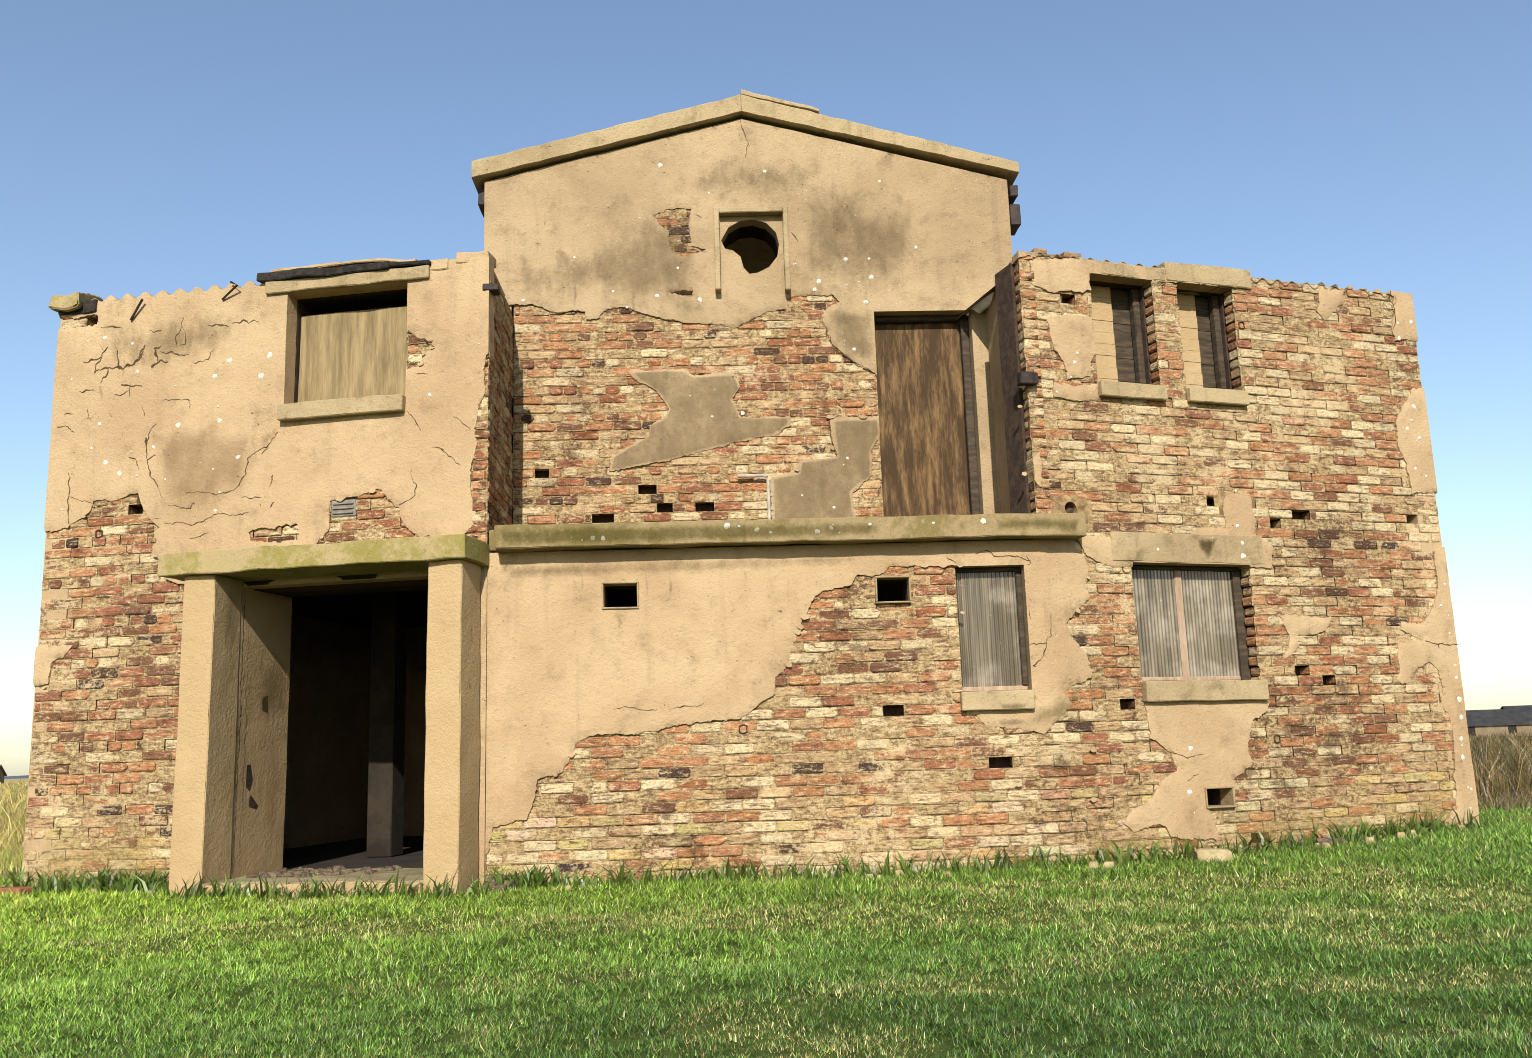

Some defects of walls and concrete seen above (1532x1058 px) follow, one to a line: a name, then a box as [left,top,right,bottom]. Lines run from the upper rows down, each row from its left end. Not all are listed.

spalling [654,209,701,257]
crack [60,317,277,539]
spalling [249,522,299,543]
spalling [318,488,430,544]
spalling [465,251,1456,886]
spalling [22,494,184,886]